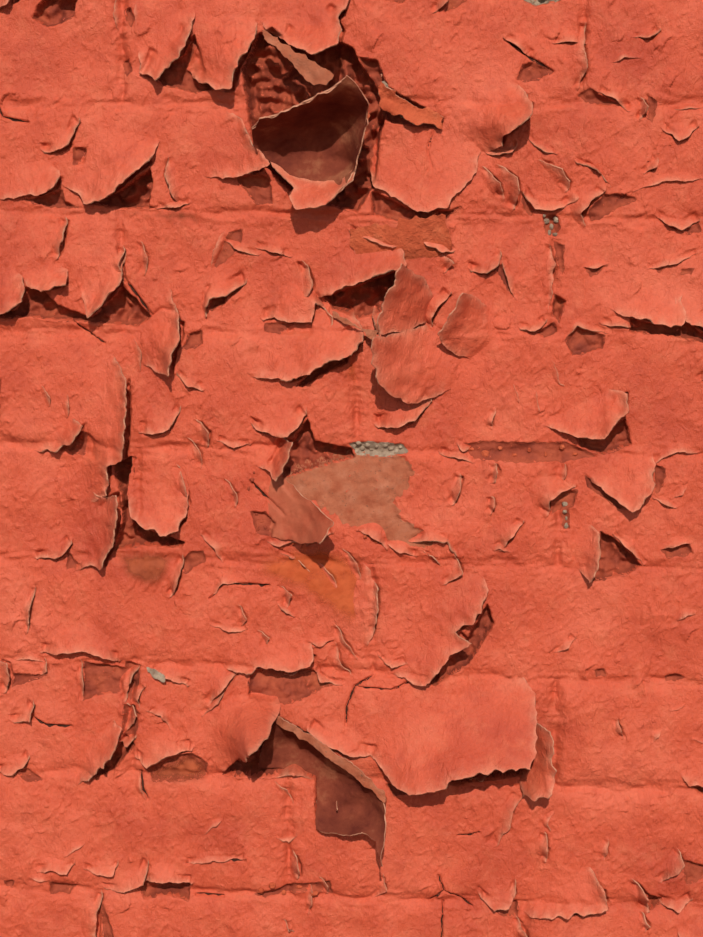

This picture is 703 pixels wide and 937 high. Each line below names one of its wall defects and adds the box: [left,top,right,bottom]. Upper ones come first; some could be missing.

spalling [33,0,77,26]
peeling [0,114,206,391]
peeling [113,0,703,429]
peeling [32,354,227,599]
peeling [438,388,699,583]
peeling [0,399,557,897]
peeling [477,867,608,937]